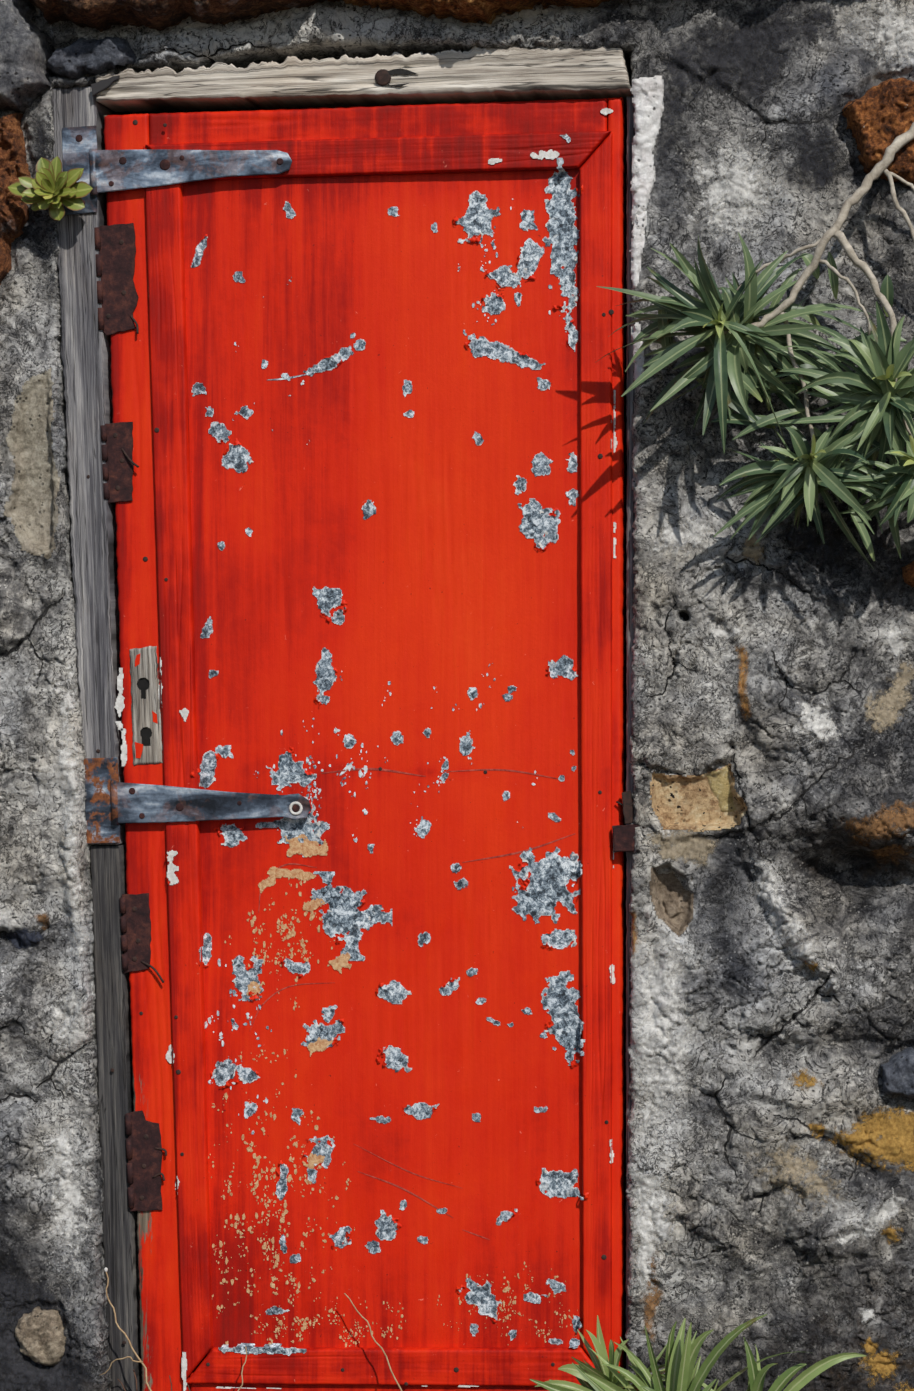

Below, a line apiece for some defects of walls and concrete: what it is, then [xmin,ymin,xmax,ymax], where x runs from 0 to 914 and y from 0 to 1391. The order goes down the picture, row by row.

peeling [431,191,500,244]
peeling [481,134,583,352]
peeling [513,452,579,551]
crack [0,927,46,942]
peeling [213,806,392,974]
peeling [509,847,582,949]
crack [0,994,91,1103]
peeling [301,1005,345,1057]
peeling [475,970,585,1068]
crack [750,971,840,1057]
crack [699,1078,877,1213]
peeling [329,1200,407,1254]